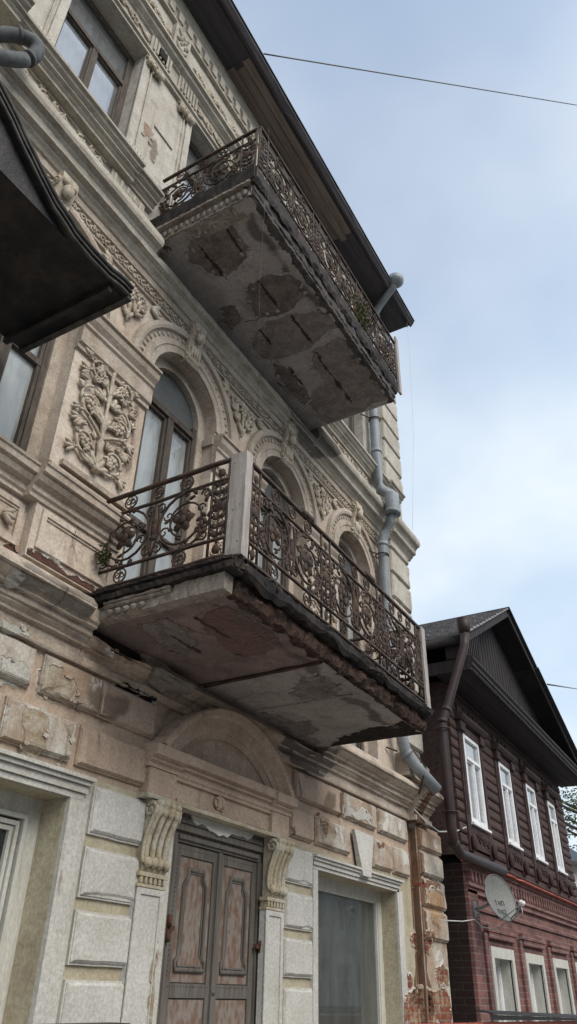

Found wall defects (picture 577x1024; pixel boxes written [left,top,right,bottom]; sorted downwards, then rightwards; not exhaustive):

flaking render [182,218,389,425]
flaking render [0,541,96,592]
flaking render [403,871,452,1024]